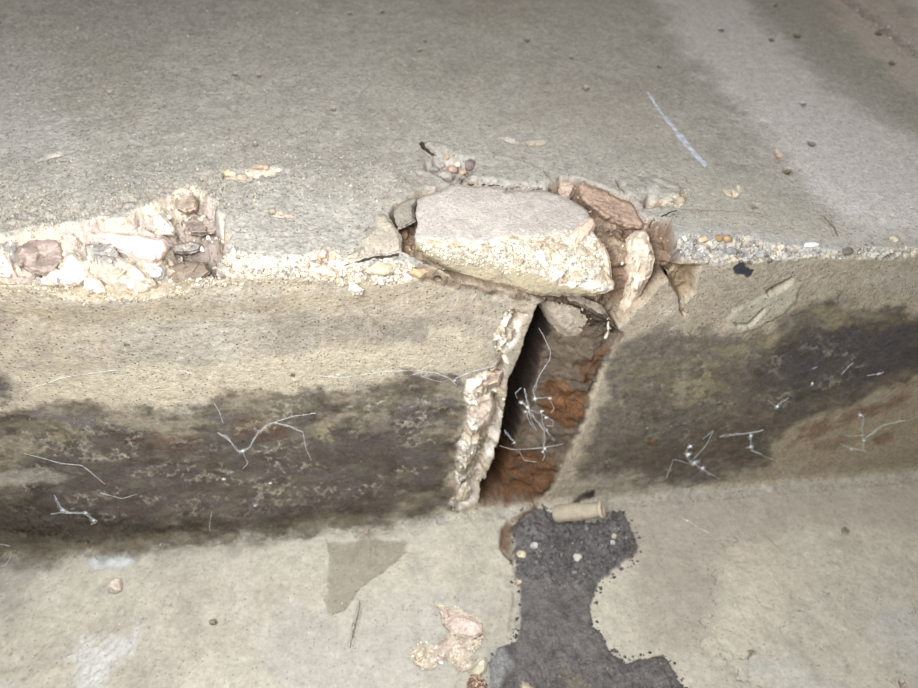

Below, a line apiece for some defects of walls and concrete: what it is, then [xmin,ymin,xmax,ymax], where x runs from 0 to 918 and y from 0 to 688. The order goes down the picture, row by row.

spalling [0,149,918,339]
damp [0,369,465,561]
spalling [446,309,529,512]
rust [478,296,626,506]
damp [580,301,918,482]